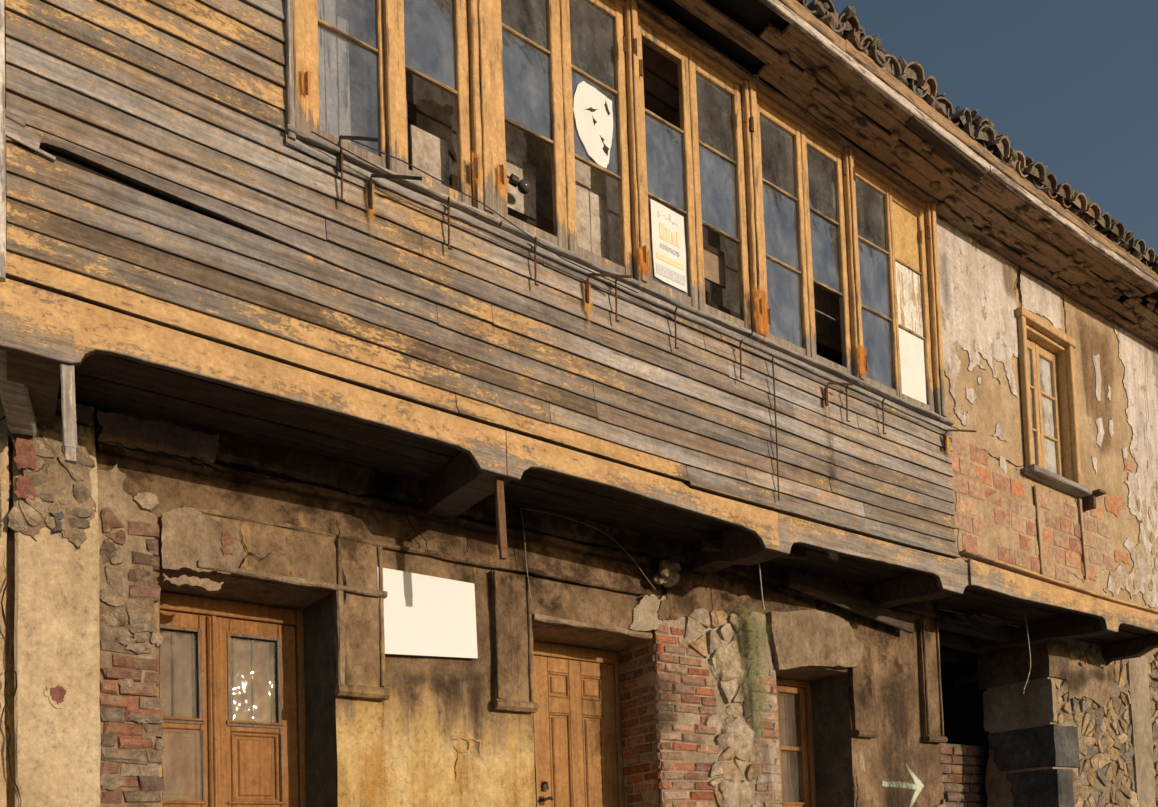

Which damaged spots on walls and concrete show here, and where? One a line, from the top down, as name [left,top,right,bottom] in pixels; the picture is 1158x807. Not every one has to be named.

rust [753,286,769,334]
peeling [936,215,1158,609]
spalling [7,405,243,807]
crack [235,530,272,576]
water stain [435,677,481,721]
spalling [619,585,864,807]